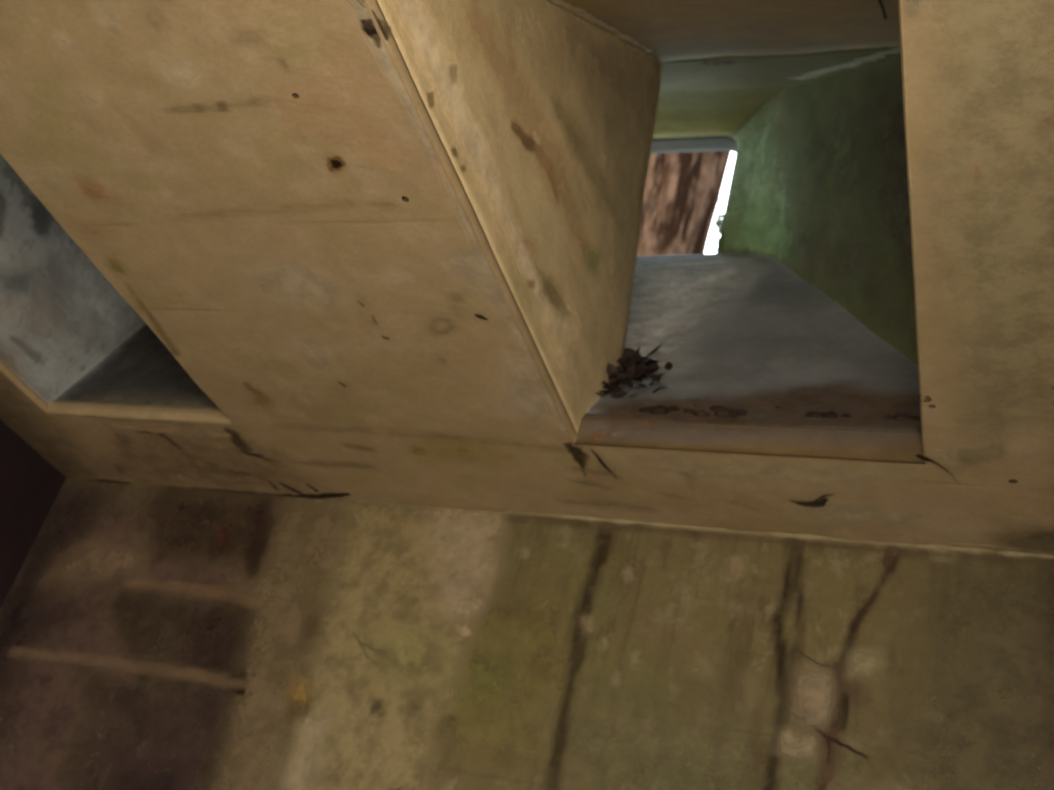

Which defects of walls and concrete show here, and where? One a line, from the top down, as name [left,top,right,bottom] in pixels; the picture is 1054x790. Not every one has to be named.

crack [791,712,868,763]